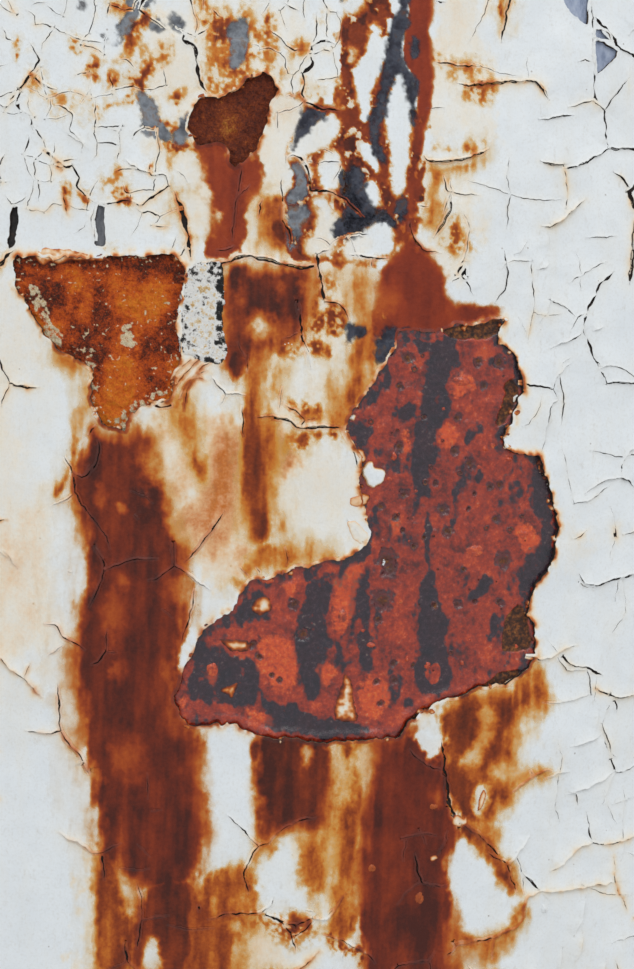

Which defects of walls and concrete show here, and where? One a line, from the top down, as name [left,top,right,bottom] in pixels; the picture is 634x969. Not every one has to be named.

crack [0,356,39,407]
crack [0,621,118,776]
peeling [5,202,189,434]
rust [102,166,131,207]
rust [69,0,174,119]
crack [0,0,389,371]
peeling [137,68,282,171]
rust [52,351,554,969]
rust [159,0,501,589]
crack [57,640,634,969]
peeling [170,315,563,747]
crack [407,0,634,633]